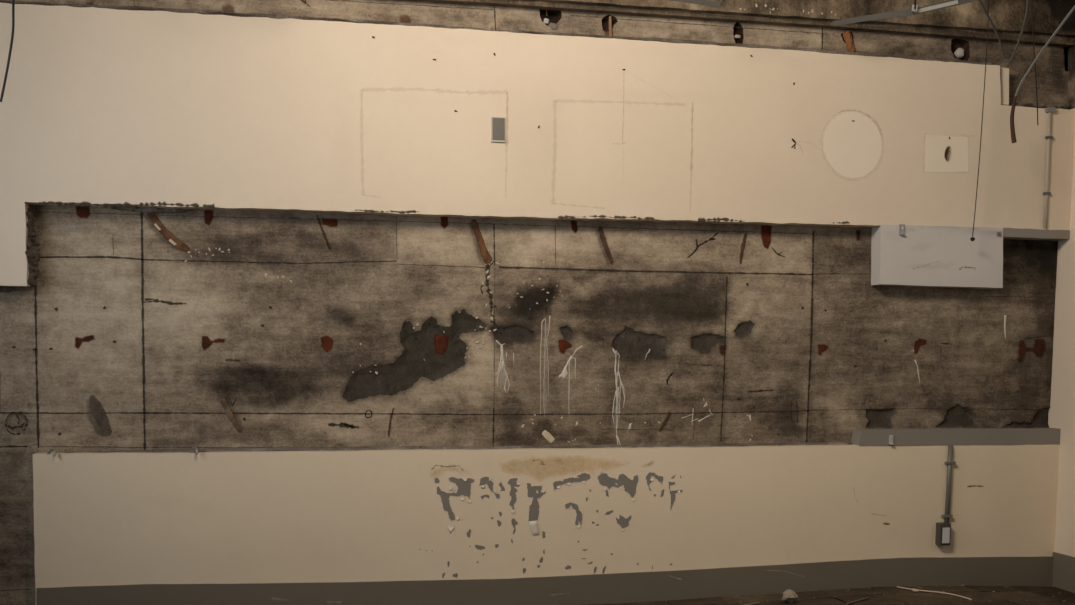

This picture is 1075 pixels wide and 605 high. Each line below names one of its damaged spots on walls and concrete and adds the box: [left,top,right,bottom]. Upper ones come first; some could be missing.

corrosion [75,335,94,349]
corrosion [202,336,225,350]
leakage [517,288,553,417]
corrosion [558,340,572,354]
corrosion [1018,339,1045,362]
leakage [496,340,514,393]
leakage [612,348,625,445]
spalling [866,408,895,428]
spalling [936,404,974,428]
peeling [435,472,683,574]